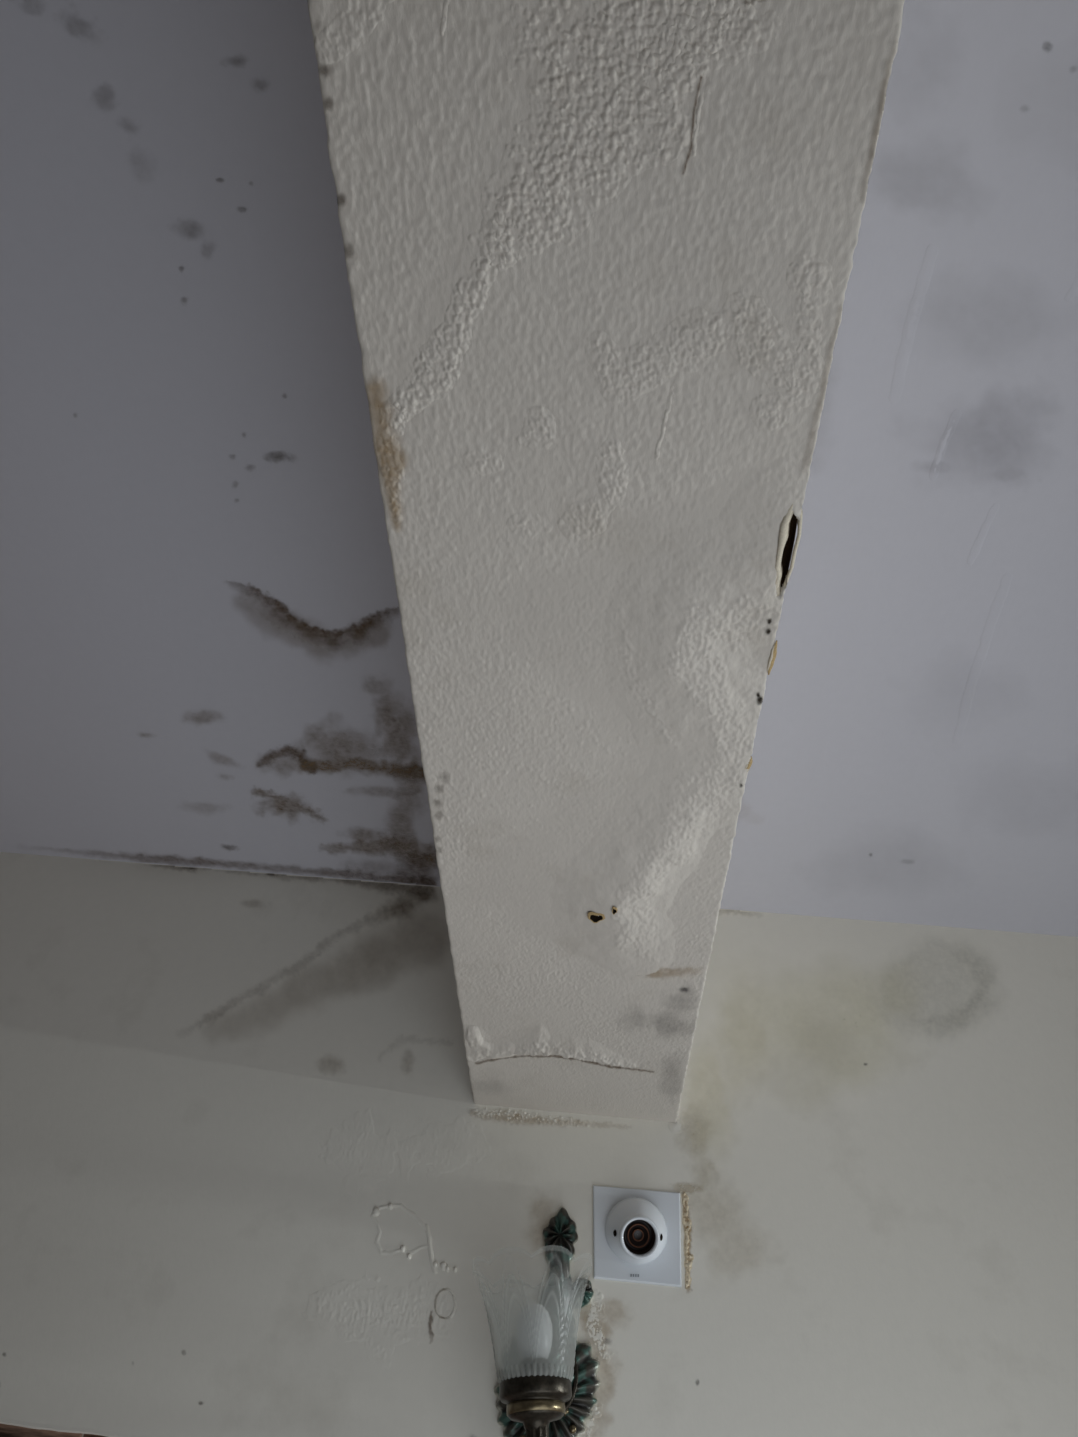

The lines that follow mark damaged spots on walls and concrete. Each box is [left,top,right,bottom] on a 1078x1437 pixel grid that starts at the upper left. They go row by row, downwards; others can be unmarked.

spalling [775,504,803,596]
water stain [251,588,388,641]
water stain [265,745,425,779]
water stain [340,840,436,891]
water stain [681,1185,700,1289]